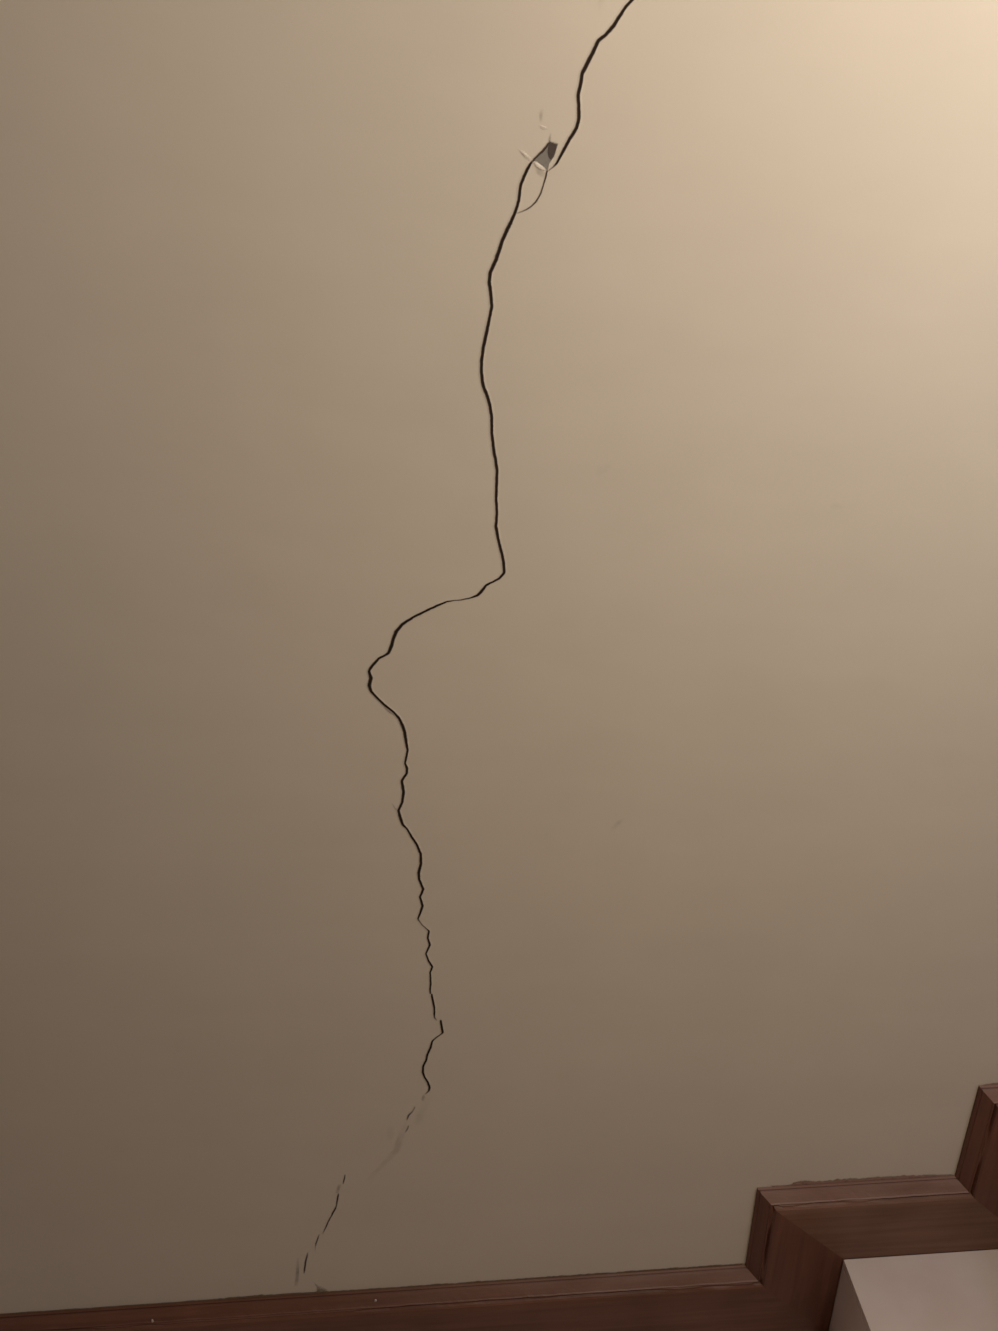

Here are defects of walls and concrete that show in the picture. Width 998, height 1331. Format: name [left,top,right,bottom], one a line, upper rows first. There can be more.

crack [366,0,637,1119]
crack [304,1176,345,1272]